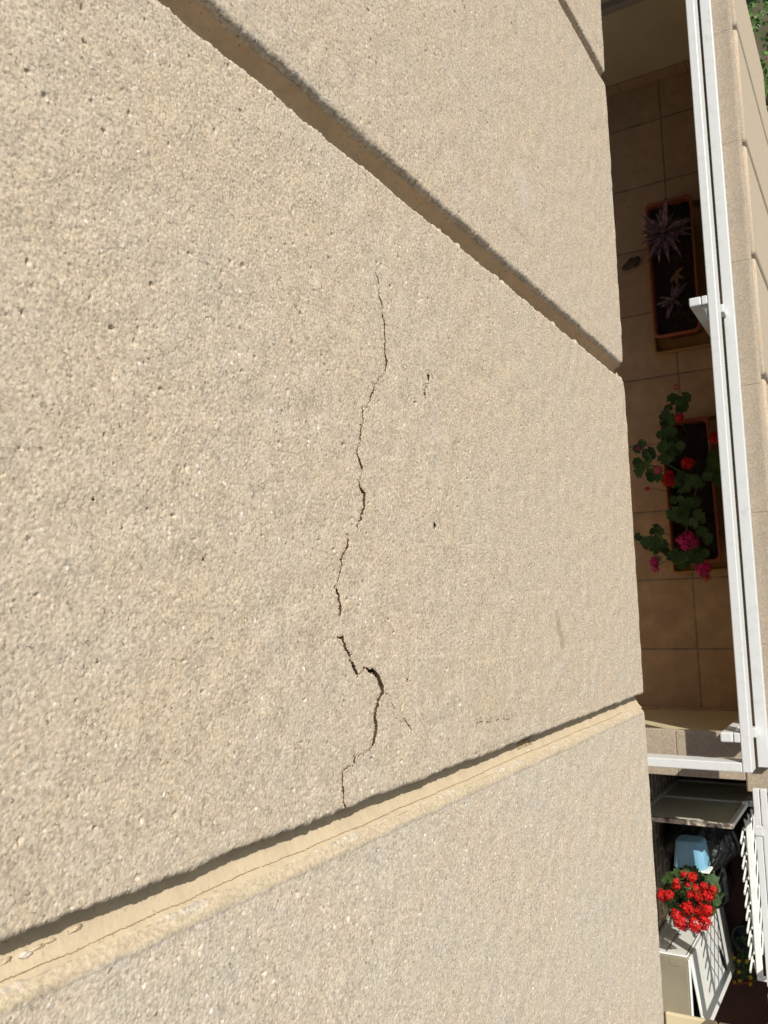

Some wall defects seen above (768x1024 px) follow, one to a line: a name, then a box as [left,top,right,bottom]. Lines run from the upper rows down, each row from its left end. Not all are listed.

crack [0,273,622,982]